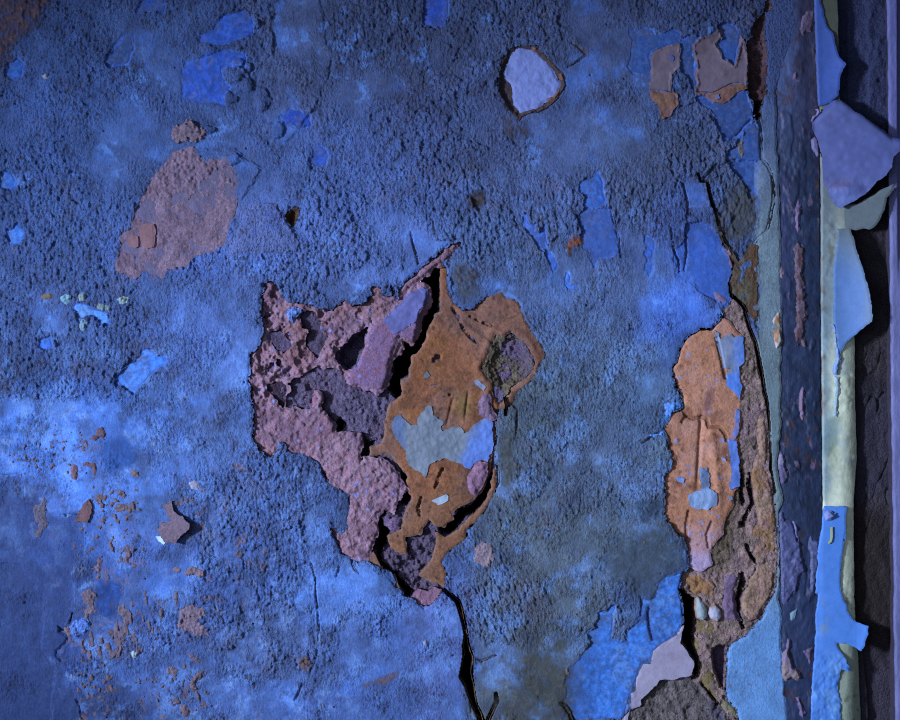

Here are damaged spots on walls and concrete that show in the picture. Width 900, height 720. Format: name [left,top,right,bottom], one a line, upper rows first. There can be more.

peeling [181,10,253,105]
flaking render [497,46,565,121]
peeling [649,24,760,195]
flaking render [115,146,238,280]
peeling [799,0,900,417]
peeling [116,350,166,393]
flaking render [248,242,546,606]
crack [671,175,775,492]
flaking render [74,499,92,523]
flaking render [156,501,190,545]
flaking render [575,290,868,720]
crack [441,588,498,720]